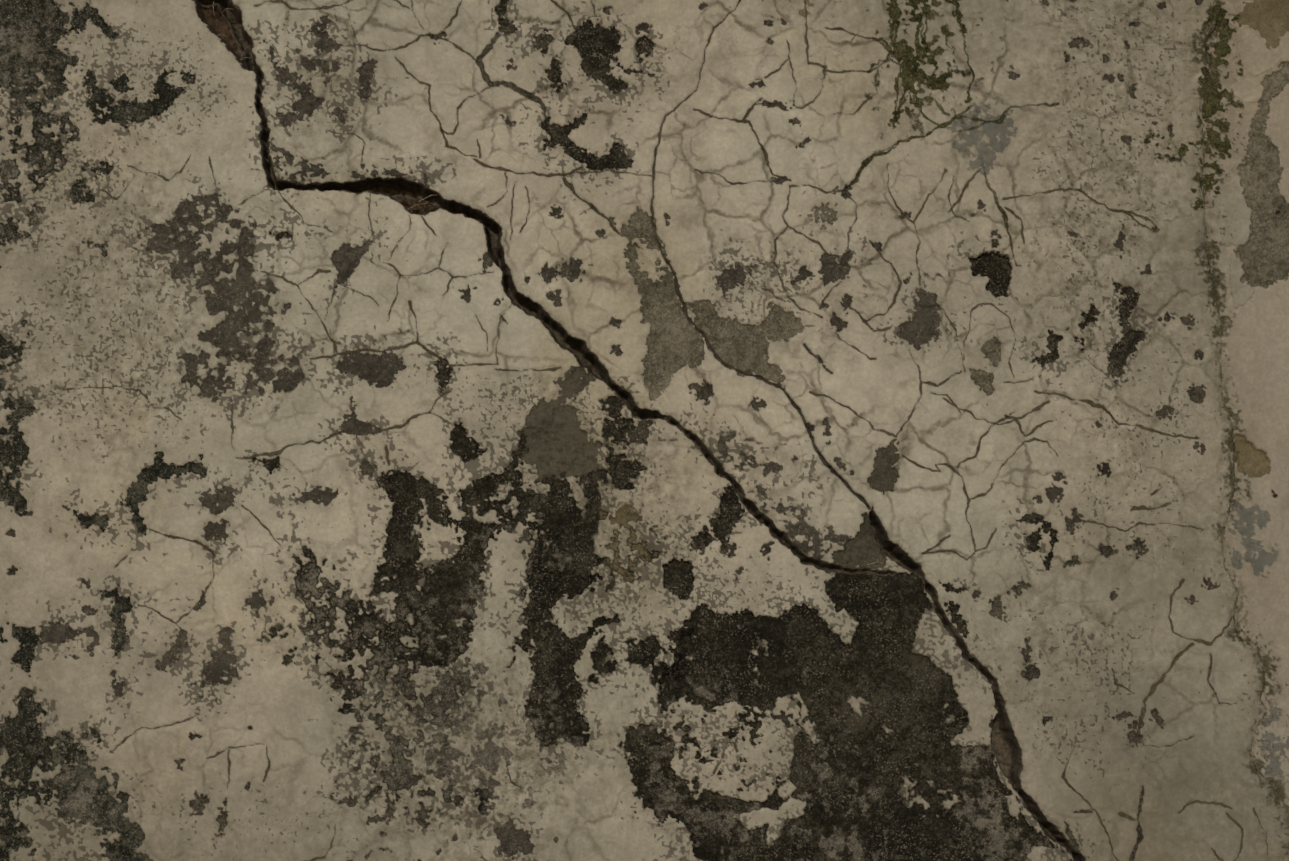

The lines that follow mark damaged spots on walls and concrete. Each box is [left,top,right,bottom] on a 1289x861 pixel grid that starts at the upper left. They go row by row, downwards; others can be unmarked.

peeling [135,193,305,402]
peeling [512,366,602,485]
crack [193,0,1199,861]
spalling [969,230,1012,298]
crack [1192,0,1234,204]
crack [1196,231,1251,502]
spalling [1223,28,1289,309]
crack [138,529,215,639]
spalling [972,581,1032,622]
spalling [1018,637,1040,681]
crack [1080,489,1280,747]
crack [1178,750,1289,861]